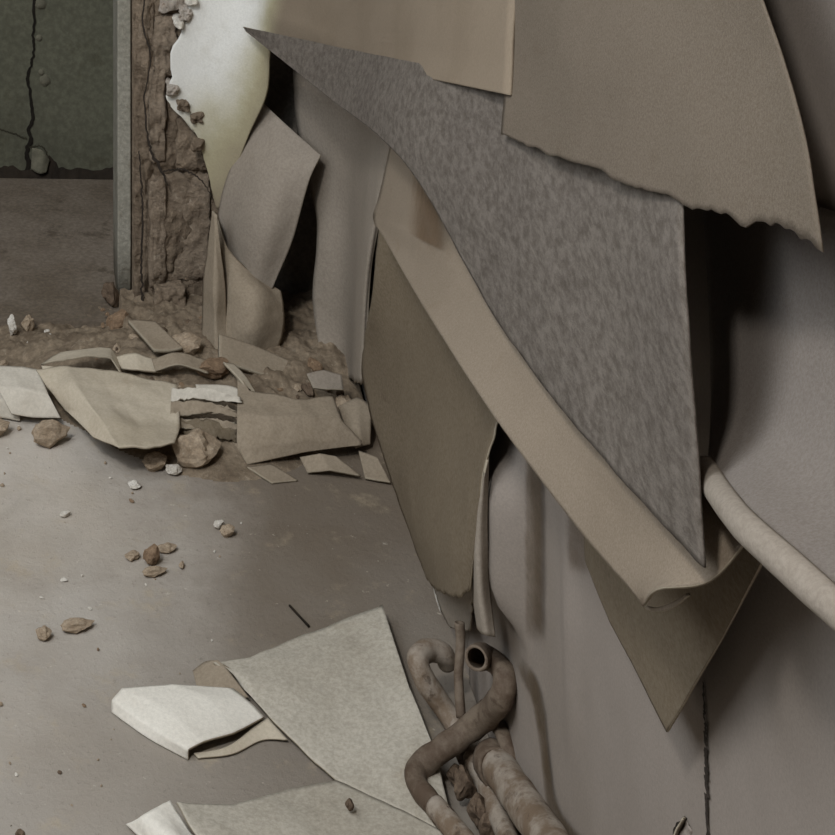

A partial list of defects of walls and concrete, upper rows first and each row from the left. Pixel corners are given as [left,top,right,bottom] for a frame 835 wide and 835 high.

crack [0,0,51,171]
spalling [131,0,219,307]
crack [701,683,709,835]